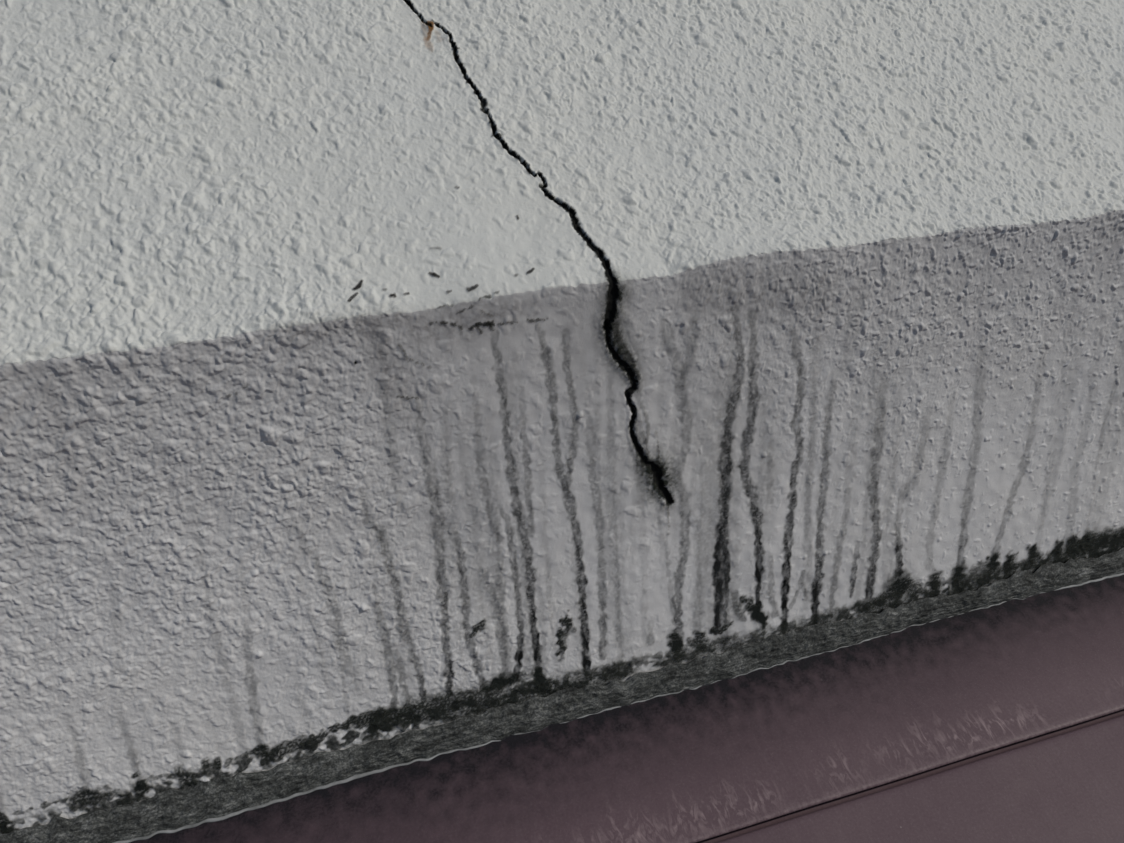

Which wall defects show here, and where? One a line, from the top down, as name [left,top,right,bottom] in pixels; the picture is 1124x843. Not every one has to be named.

crack [404,0,674,505]
water stain [0,357,1124,834]